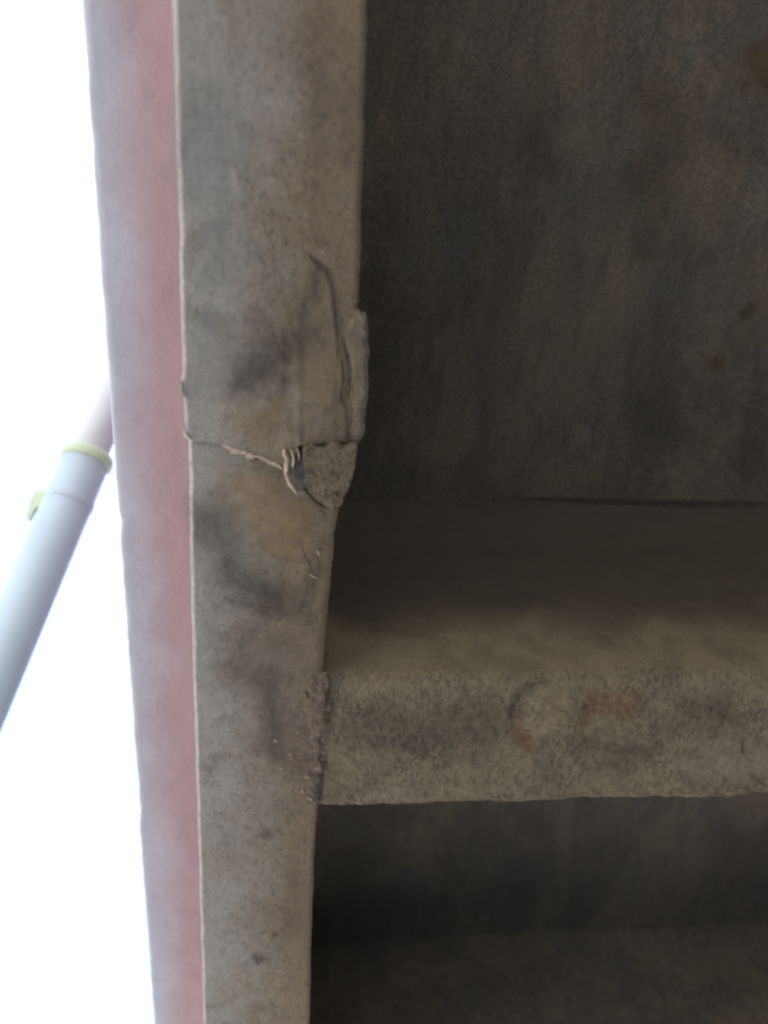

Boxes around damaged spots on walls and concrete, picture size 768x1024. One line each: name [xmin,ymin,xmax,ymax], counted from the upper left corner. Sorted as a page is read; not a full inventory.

crack [302,256,354,446]
crack [203,441,284,470]
spalling [282,441,358,523]